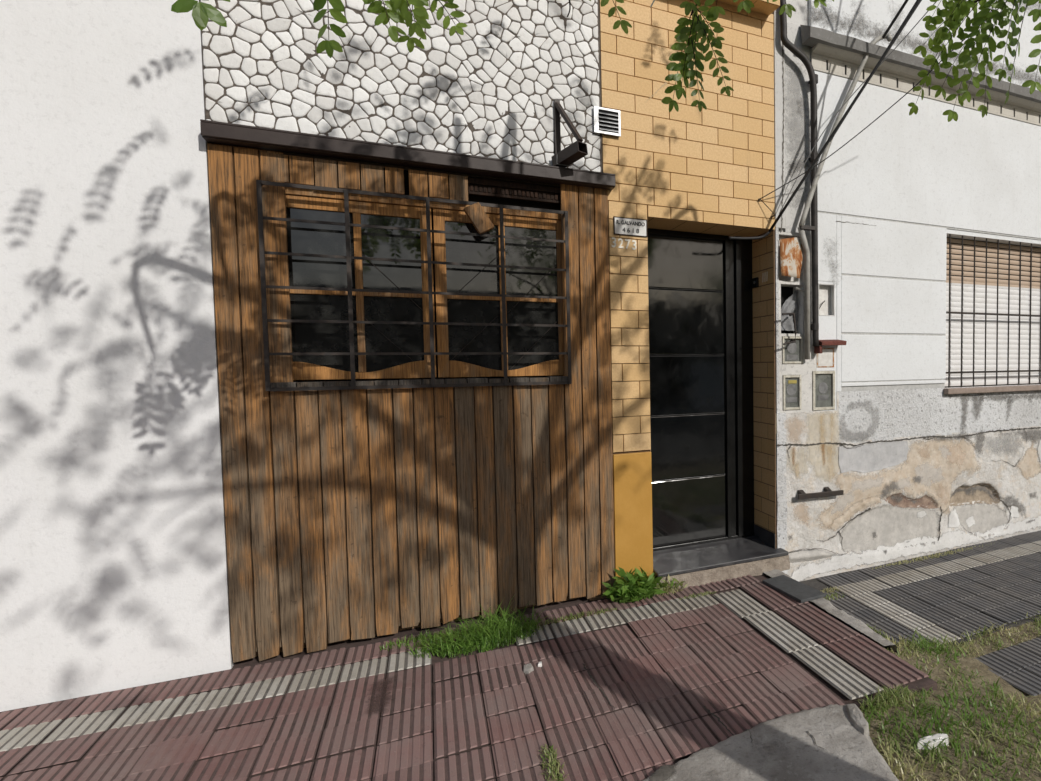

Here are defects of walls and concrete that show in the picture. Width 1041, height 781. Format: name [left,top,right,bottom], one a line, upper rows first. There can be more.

leakage [840,402,878,440]
crack [777,427,1041,467]
leakage [928,393,1041,453]
peeling [791,438,1041,581]